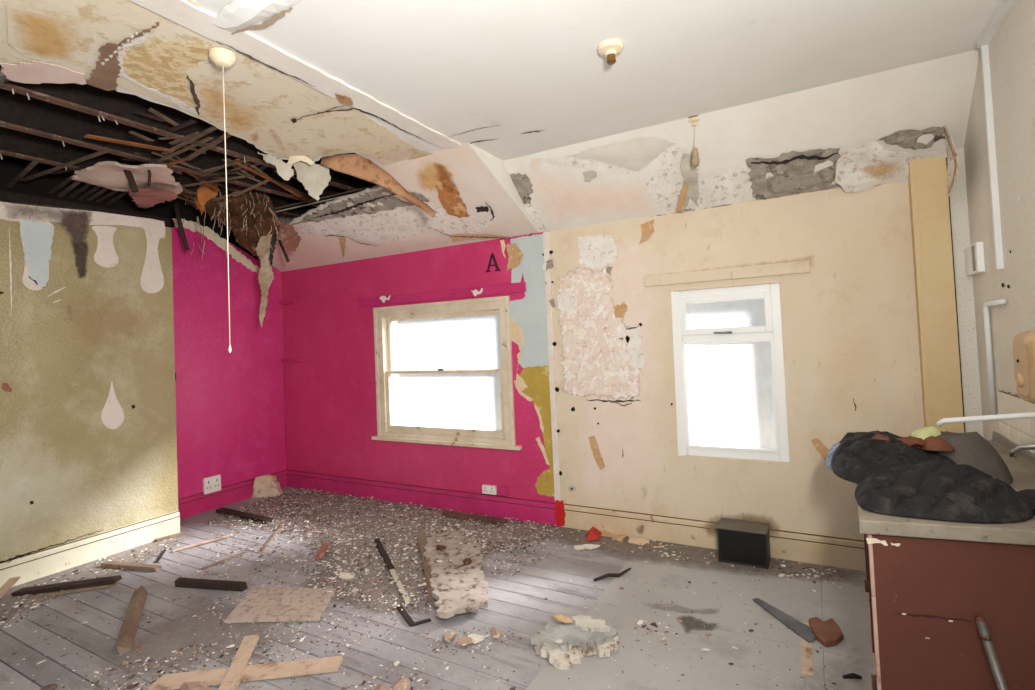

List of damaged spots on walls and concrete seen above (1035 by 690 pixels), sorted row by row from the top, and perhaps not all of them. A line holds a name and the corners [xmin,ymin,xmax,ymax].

peeling [0,0,418,165]
water stain [407,152,457,194]
spalling [510,173,533,205]
flaking render [542,157,633,182]
flaking render [646,124,959,212]
flaking render [292,188,524,283]
peeling [542,235,644,411]